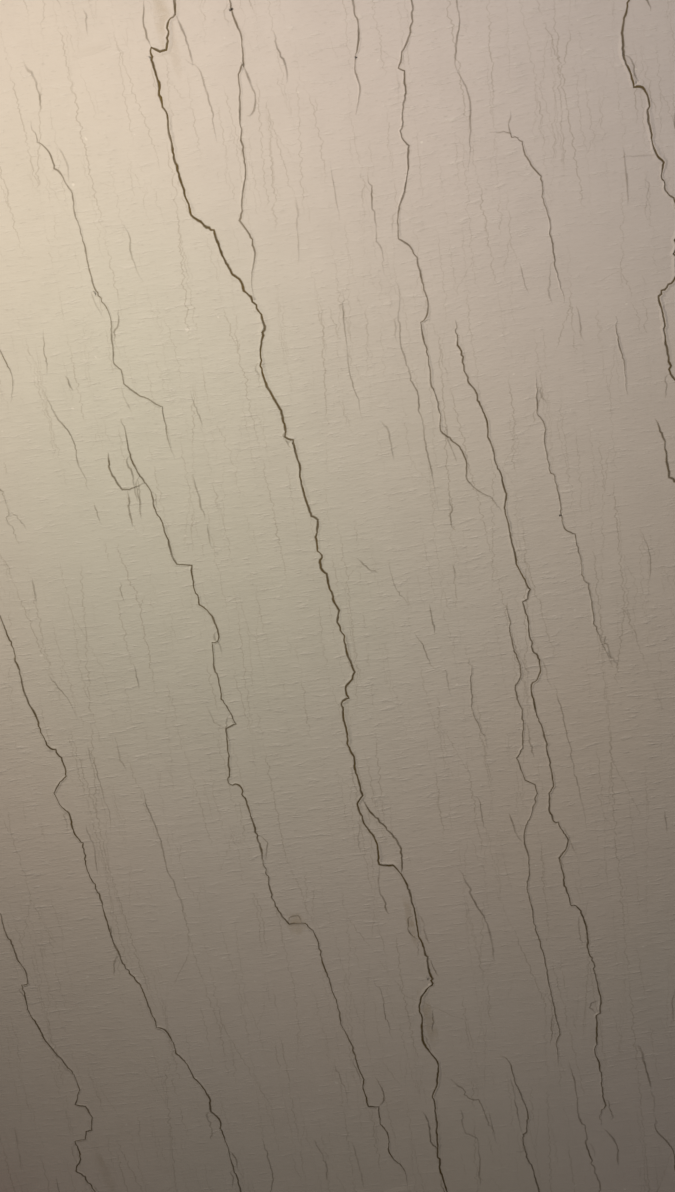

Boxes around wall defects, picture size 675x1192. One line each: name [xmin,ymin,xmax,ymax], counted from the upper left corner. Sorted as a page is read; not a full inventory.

crack [0,0,450,1192]
crack [395,0,613,1122]
crack [614,316,628,394]
crack [618,0,675,383]
crack [659,427,675,482]
crack [500,1055,542,1192]